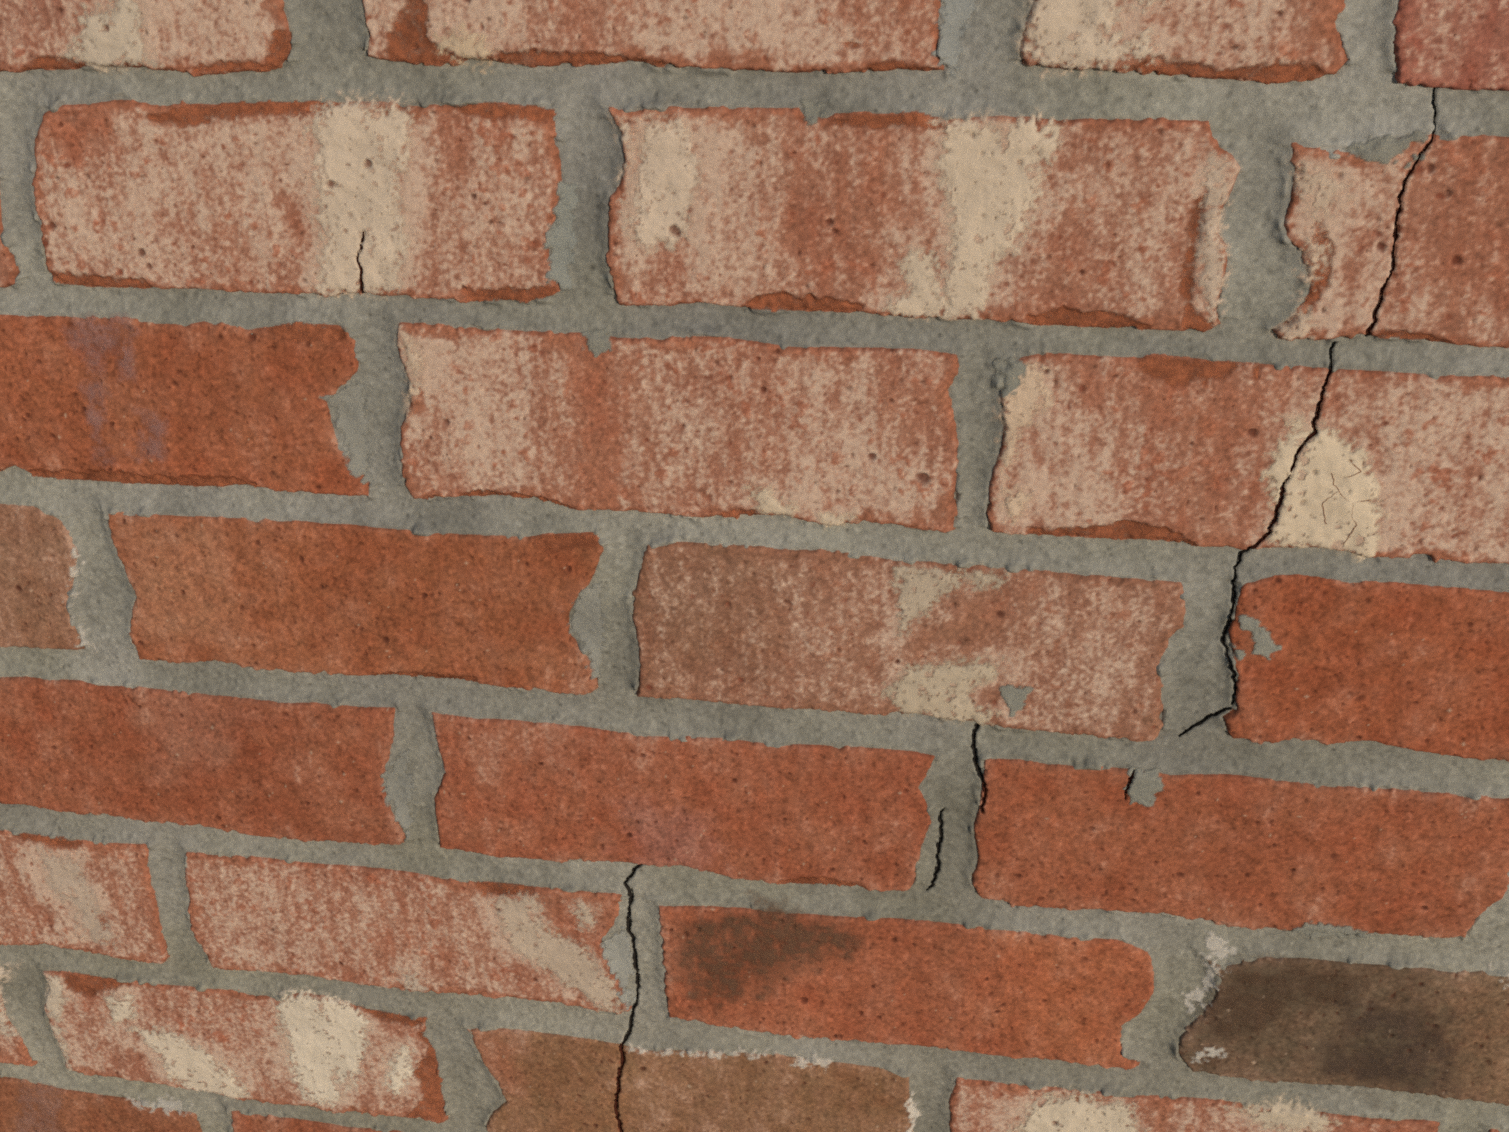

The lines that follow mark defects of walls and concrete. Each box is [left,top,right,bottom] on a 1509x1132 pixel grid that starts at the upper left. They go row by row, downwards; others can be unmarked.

crack [1179,87,1437,737]
crack [971,723,987,814]
crack [926,809,944,891]
crack [614,864,642,1132]
efflorescence [1174,932,1236,1014]
efflorescence [1192,1048,1226,1063]